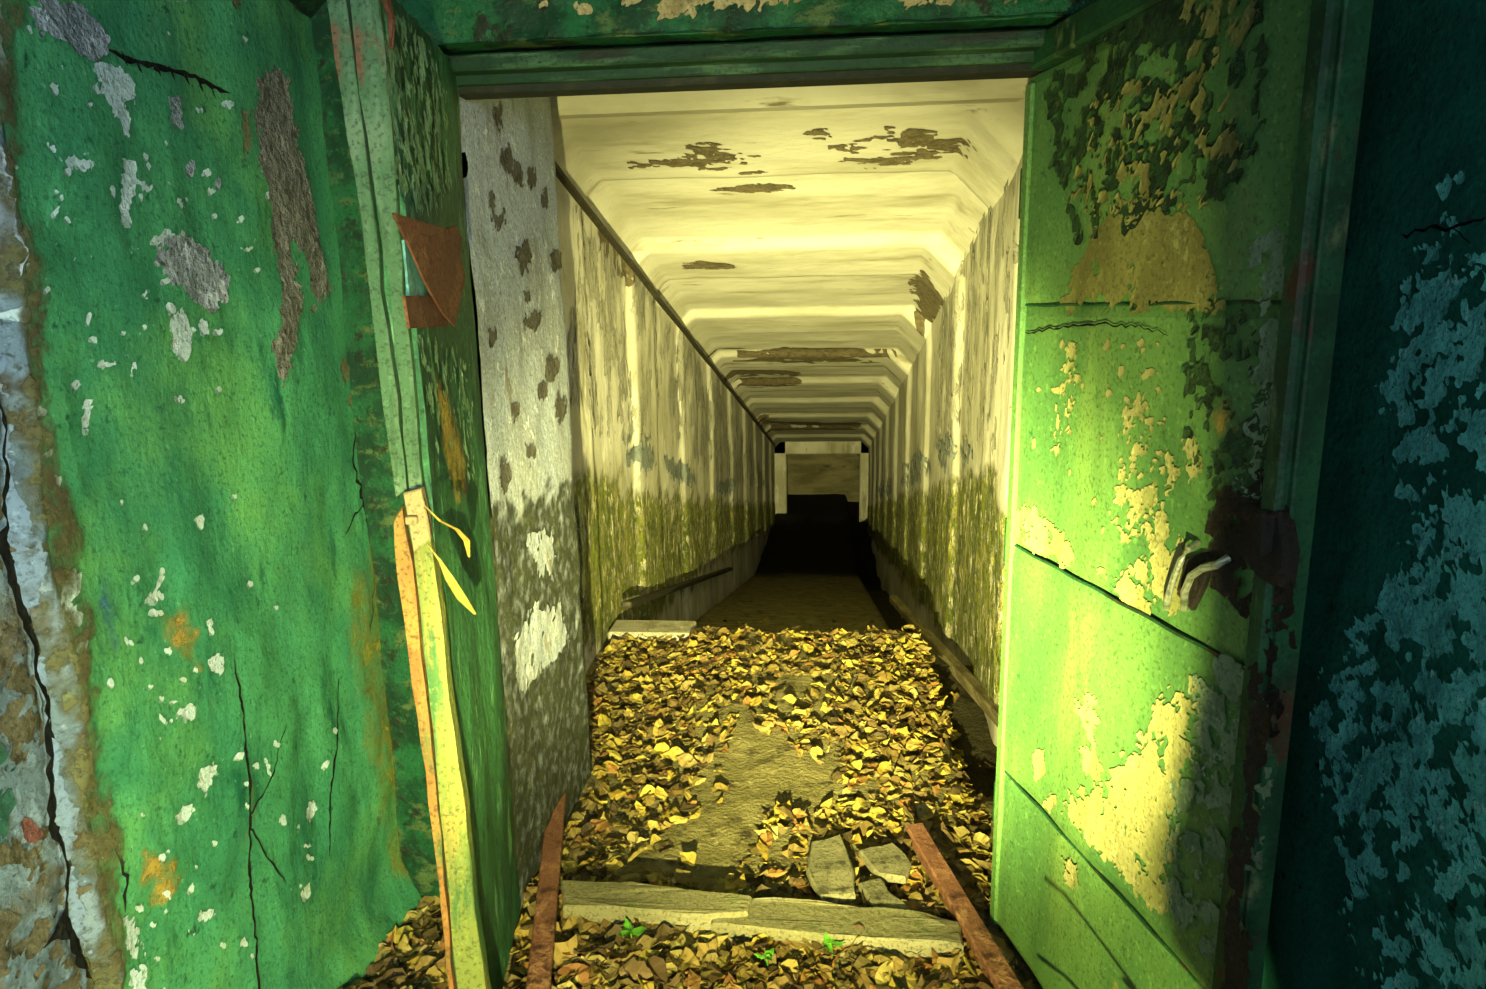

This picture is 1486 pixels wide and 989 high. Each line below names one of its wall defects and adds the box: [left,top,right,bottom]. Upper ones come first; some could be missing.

crack [108,49,231,98]
flaking render [131,228,230,362]
peeling [627,142,796,193]
peeling [537,205,897,498]
peeling [803,126,976,169]
peeling [1043,0,1285,616]
crack [0,402,94,983]
flaking render [0,351,104,989]
peeling [514,598,570,694]
peeling [1032,641,1245,963]
corrosion [1204,468,1297,989]
peeling [1309,170,1486,989]